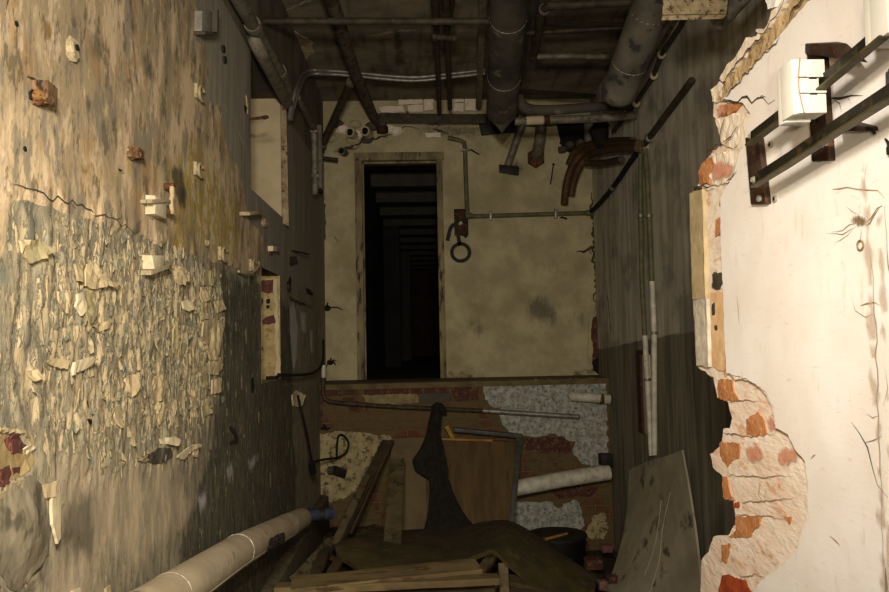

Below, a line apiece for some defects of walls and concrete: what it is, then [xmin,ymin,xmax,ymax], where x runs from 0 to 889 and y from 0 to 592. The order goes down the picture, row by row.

crack [723,95,774,104]
crack [15,184,142,234]
crack [837,166,889,273]
peeling [18,213,255,481]
spalling [261,279,281,379]
spalling [689,0,810,592]
spalling [0,427,36,499]
peeling [320,316,609,502]
peeling [515,485,609,540]
crack [851,295,888,592]